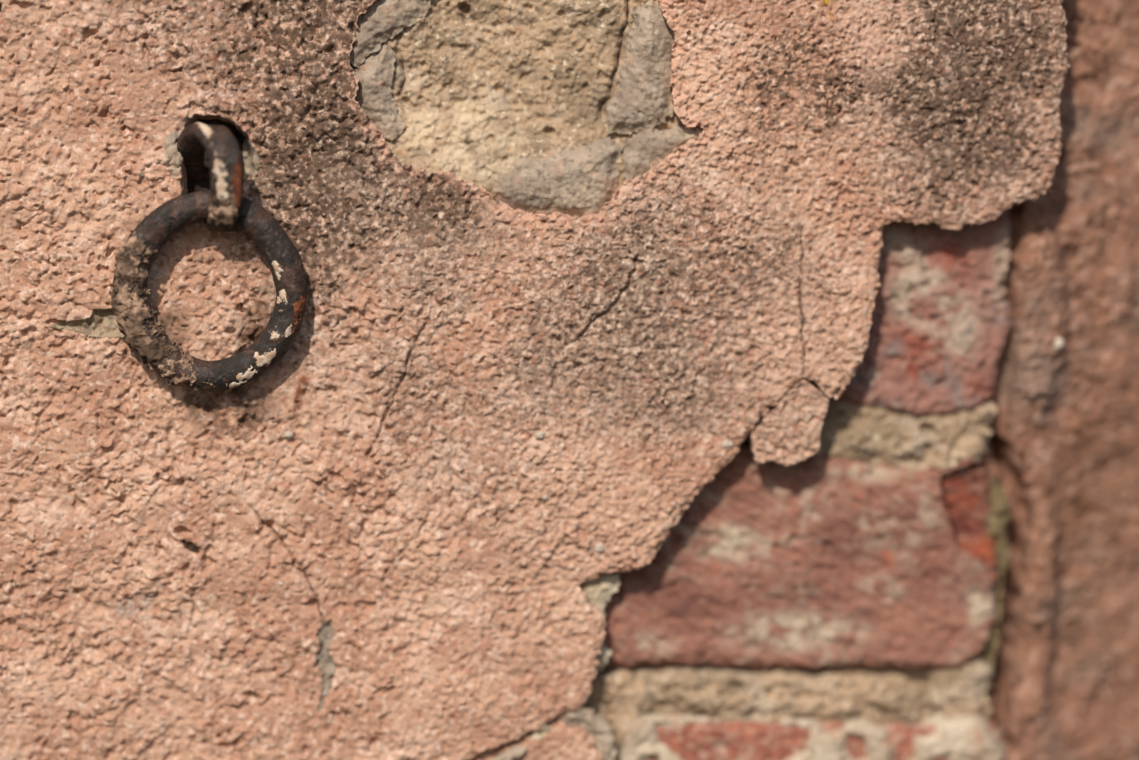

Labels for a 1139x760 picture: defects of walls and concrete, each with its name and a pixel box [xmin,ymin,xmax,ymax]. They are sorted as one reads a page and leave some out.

flaking render [350,0,704,217]
rust [290,287,305,336]
flaking render [563,210,1013,760]
crack [254,510,325,621]
crack [472,713,565,760]